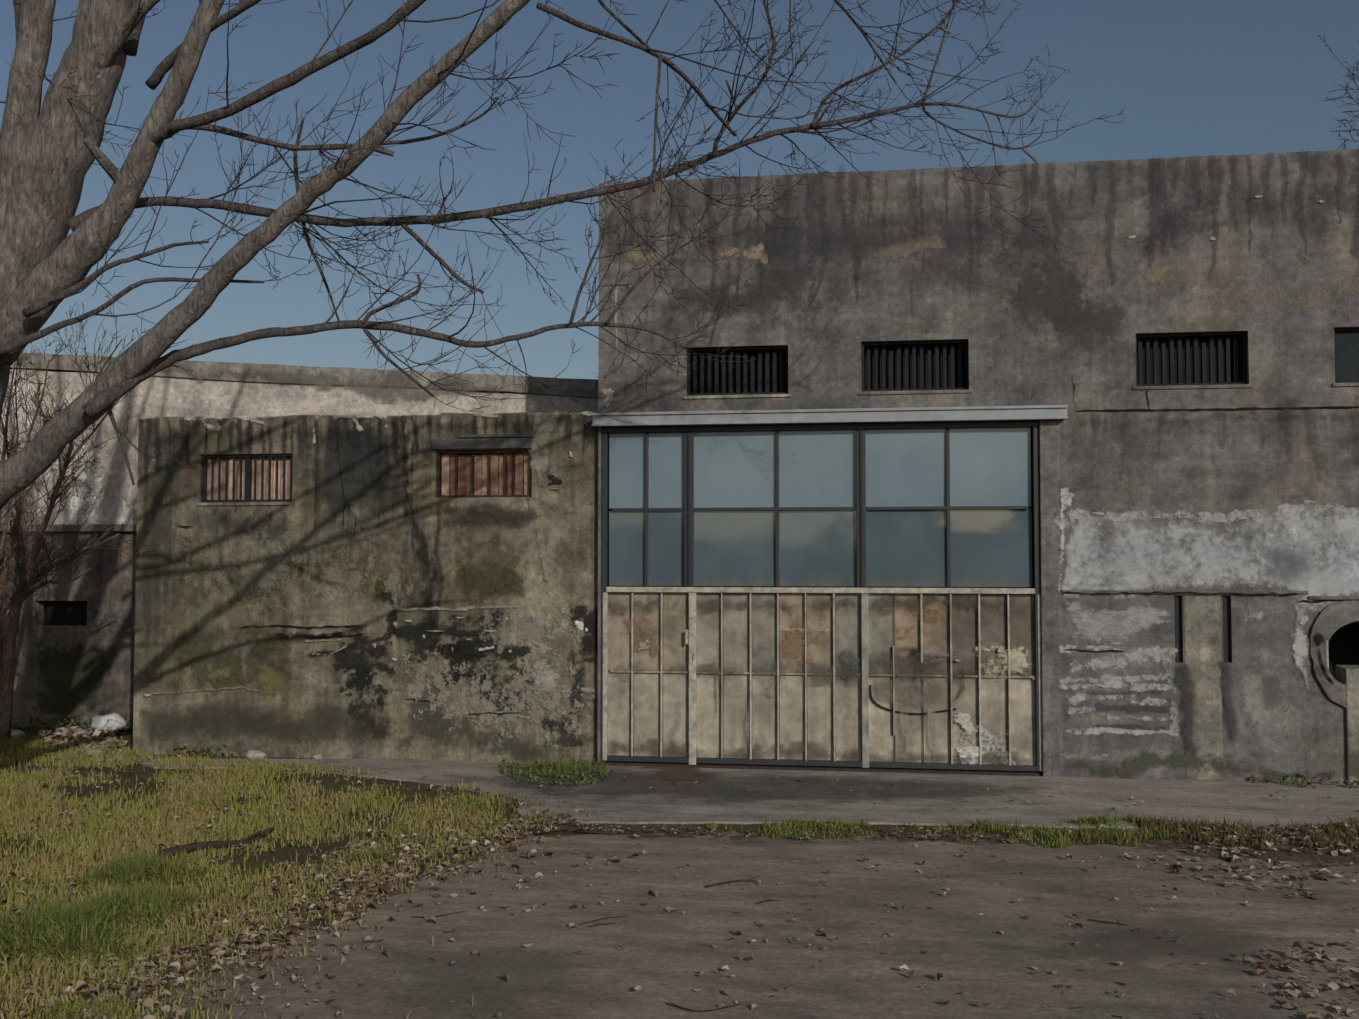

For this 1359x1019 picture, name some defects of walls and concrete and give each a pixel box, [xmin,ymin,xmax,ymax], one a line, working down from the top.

leakage [140,364,598,758]
flaking render [1058,488,1104,591]
flaking render [392,605,596,745]
spalling [1315,633,1335,685]
leakage [516,771,996,800]